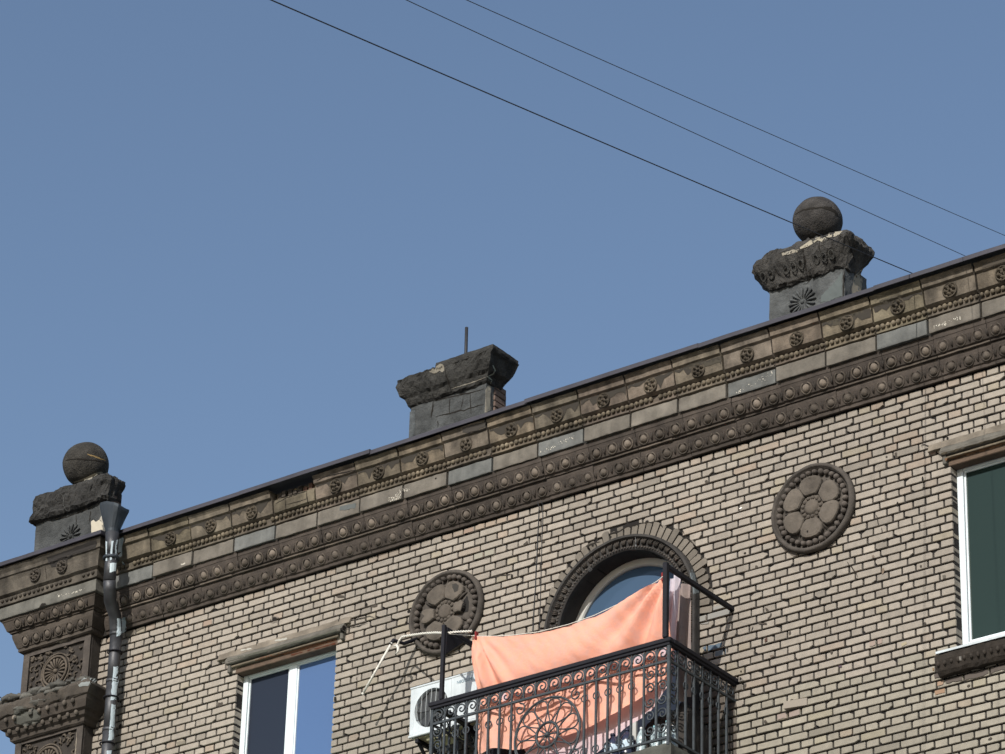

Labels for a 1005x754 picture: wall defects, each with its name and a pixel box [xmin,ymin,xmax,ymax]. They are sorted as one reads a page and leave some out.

flaking render [493,387,506,410]
flaking render [91,516,125,572]